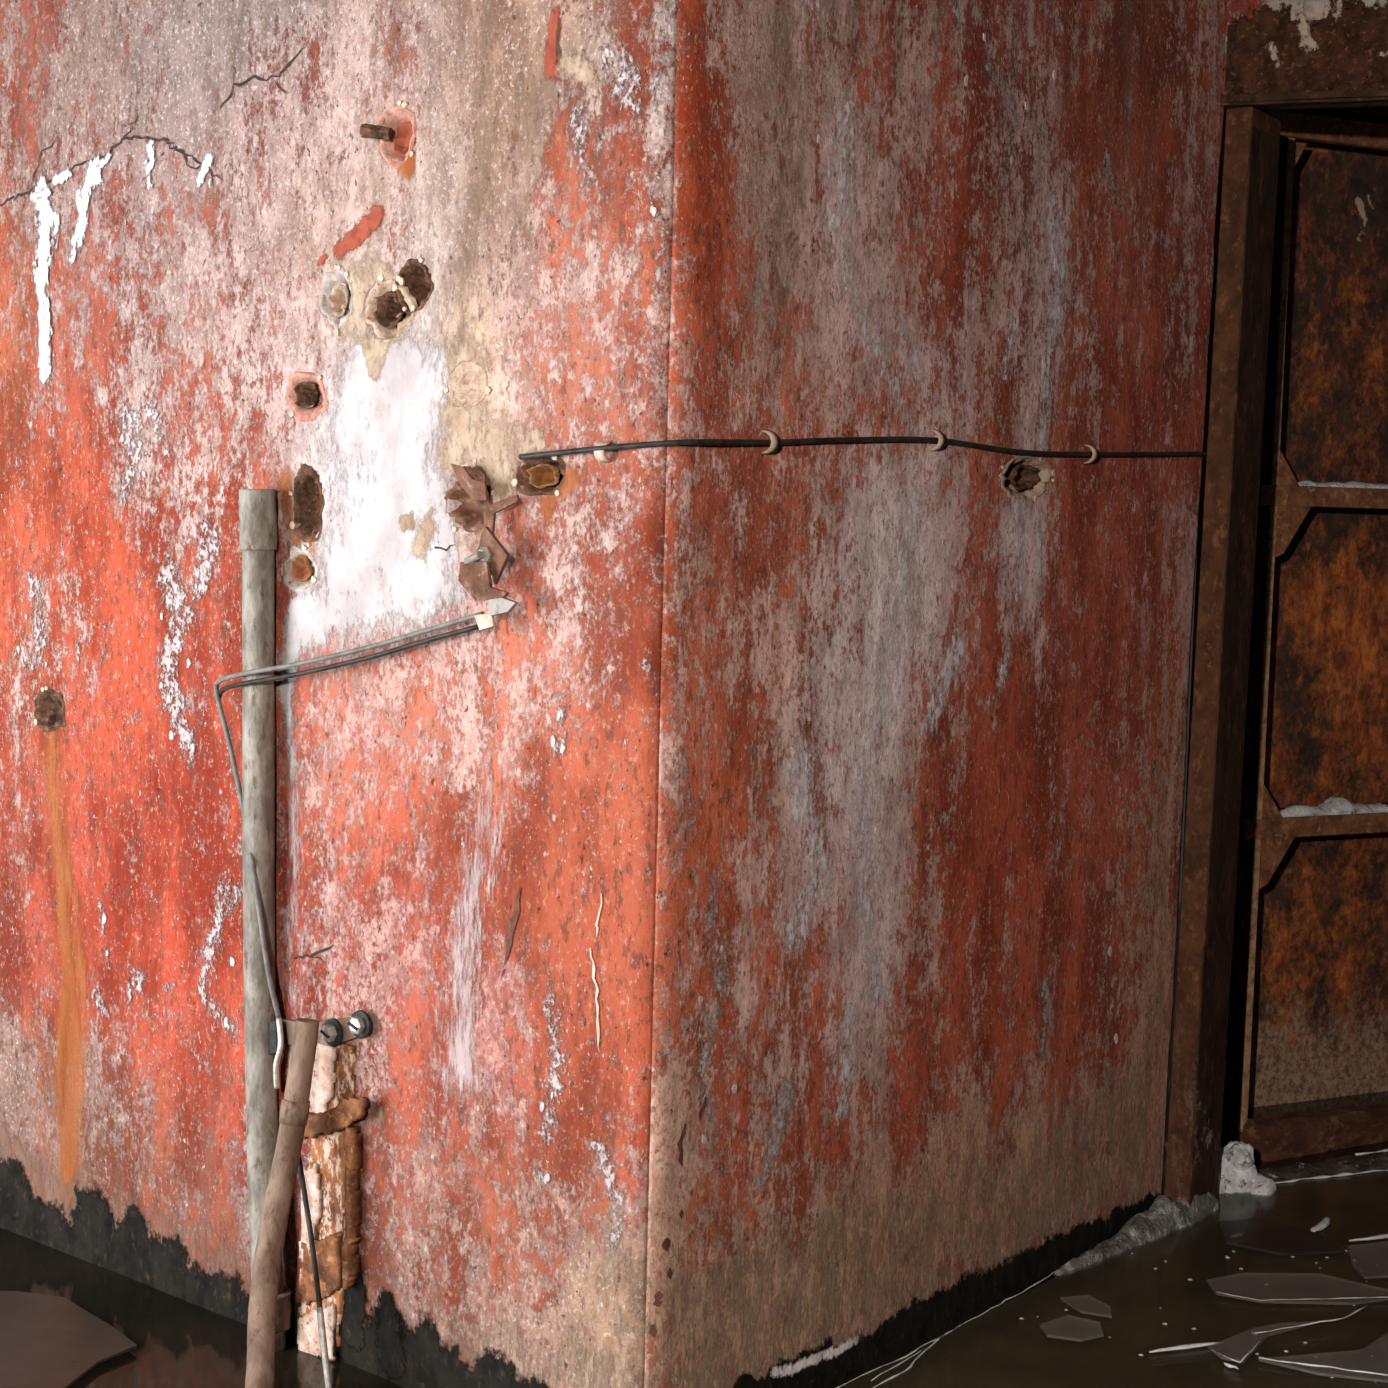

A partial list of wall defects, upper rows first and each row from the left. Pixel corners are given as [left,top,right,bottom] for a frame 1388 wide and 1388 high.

crack [0,116,223,206]
water stain [196,153,214,188]
crack [220,47,305,108]
spalling [360,101,417,170]
peeling [1264,41,1280,69]
peeling [1296,13,1319,54]
water stain [30,151,112,386]
peeling [274,258,496,766]
rust [48,732,86,1205]
water stain [0,1127,251,1325]
water stain [336,1211,652,1388]
water stain [665,887,1192,1388]